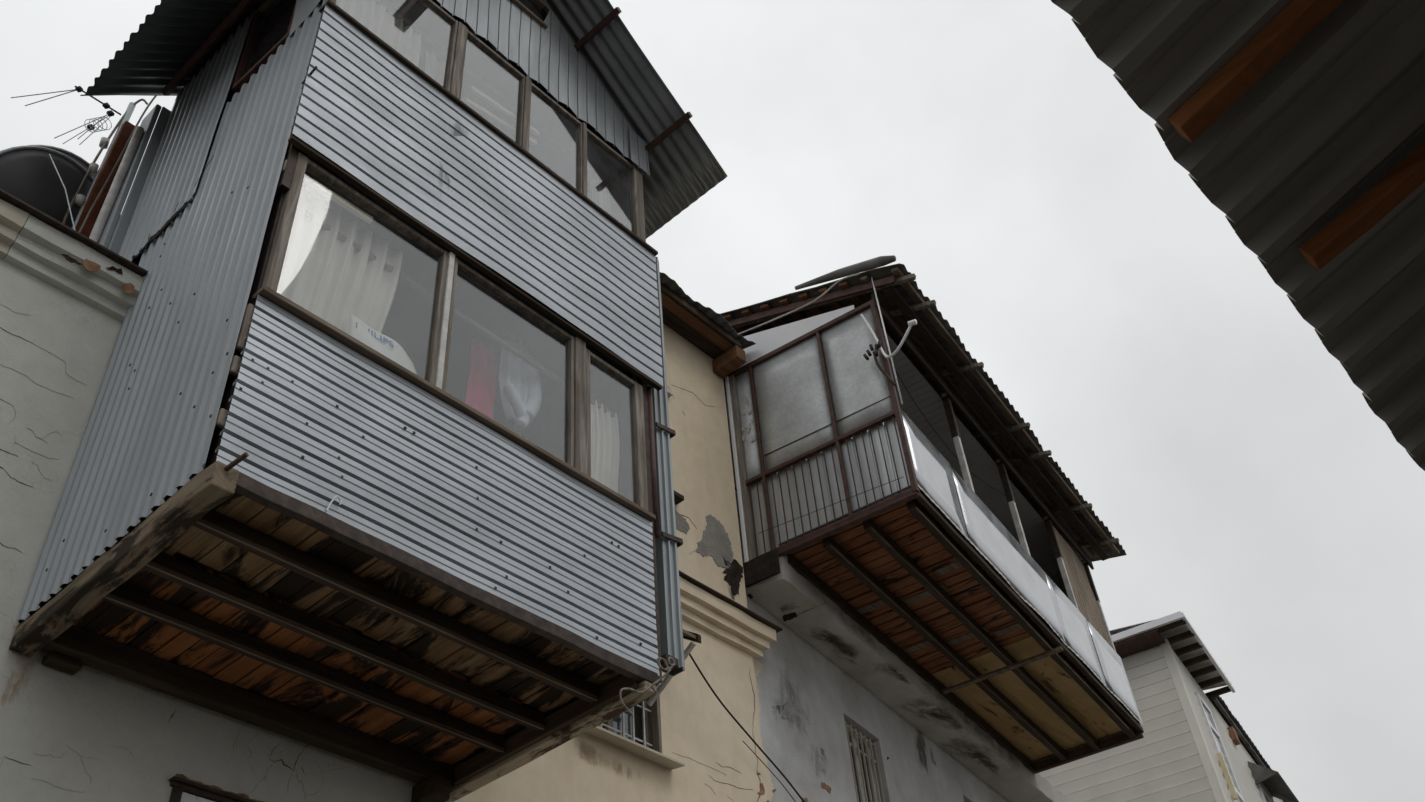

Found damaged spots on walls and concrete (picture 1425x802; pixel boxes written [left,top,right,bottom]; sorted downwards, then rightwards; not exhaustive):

flaking render [61,254,135,294]
crack [0,304,83,487]
peeling [675,509,753,599]
crack [0,744,96,792]